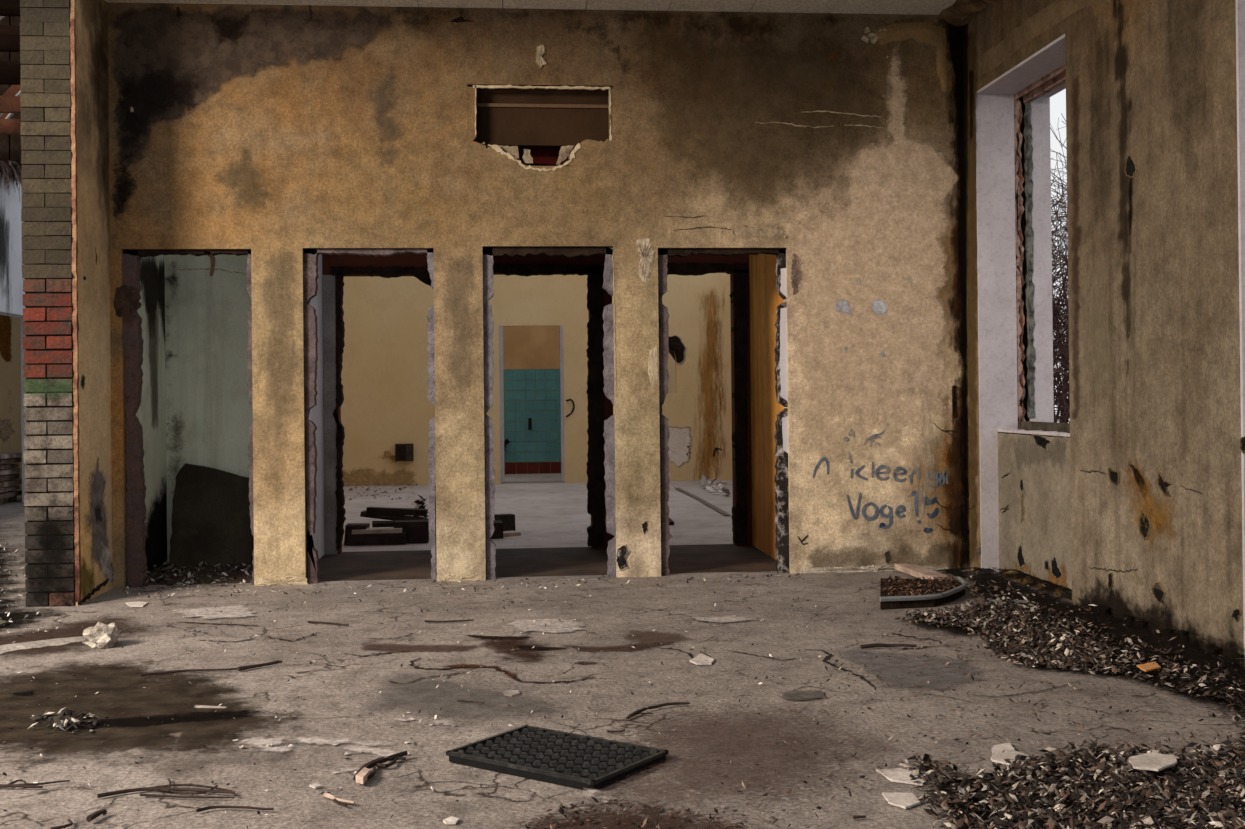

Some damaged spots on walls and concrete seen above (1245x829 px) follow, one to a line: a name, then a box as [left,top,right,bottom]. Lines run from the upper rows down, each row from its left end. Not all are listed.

flaking render [535,44,547,69]
leakage [98,4,429,215]
spalling [468,85,614,171]
crack [759,110,883,128]
leakage [0,214,9,281]
leakage [1113,0,1135,456]
flaking render [113,285,142,319]
leakage [139,256,177,426]
flaking render [648,335,687,388]
leakage [910,19,981,587]
leakage [145,421,184,571]
leakage [912,619,989,635]